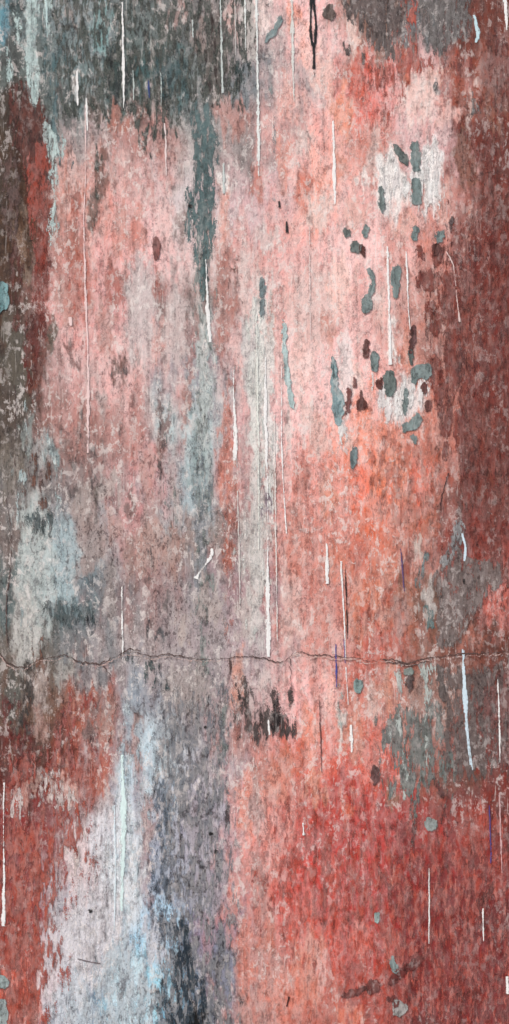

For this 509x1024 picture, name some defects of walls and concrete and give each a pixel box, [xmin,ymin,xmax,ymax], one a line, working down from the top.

crack [0,385,506,742]
peeling [322,0,509,645]